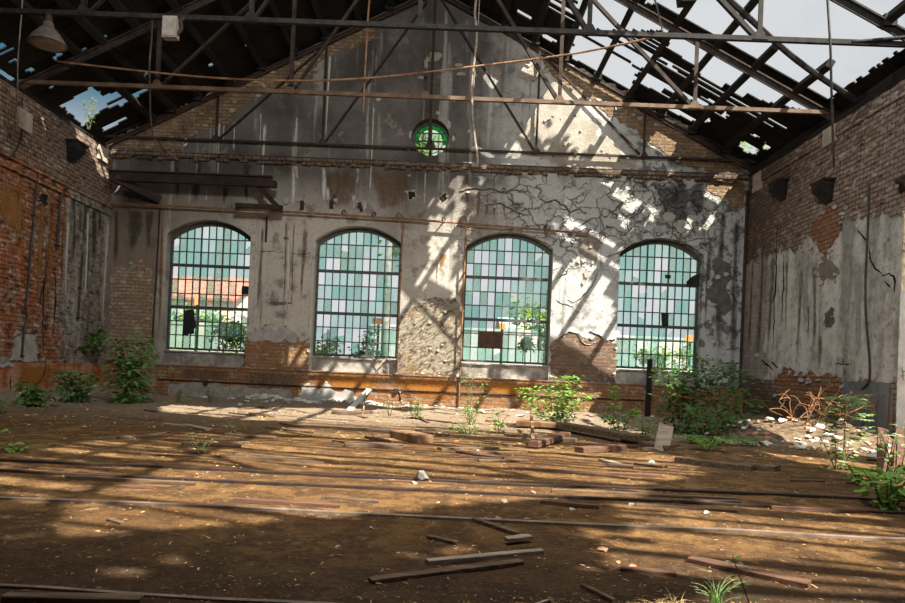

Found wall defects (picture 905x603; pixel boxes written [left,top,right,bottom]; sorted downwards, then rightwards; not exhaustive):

crack [556,269,598,307]
leakage [705,215,738,345]
leakage [749,247,774,339]
spalling [807,204,847,285]
spalling [0,334,39,368]
spalling [243,324,311,370]
spalling [396,296,464,377]
spalling [548,331,618,383]